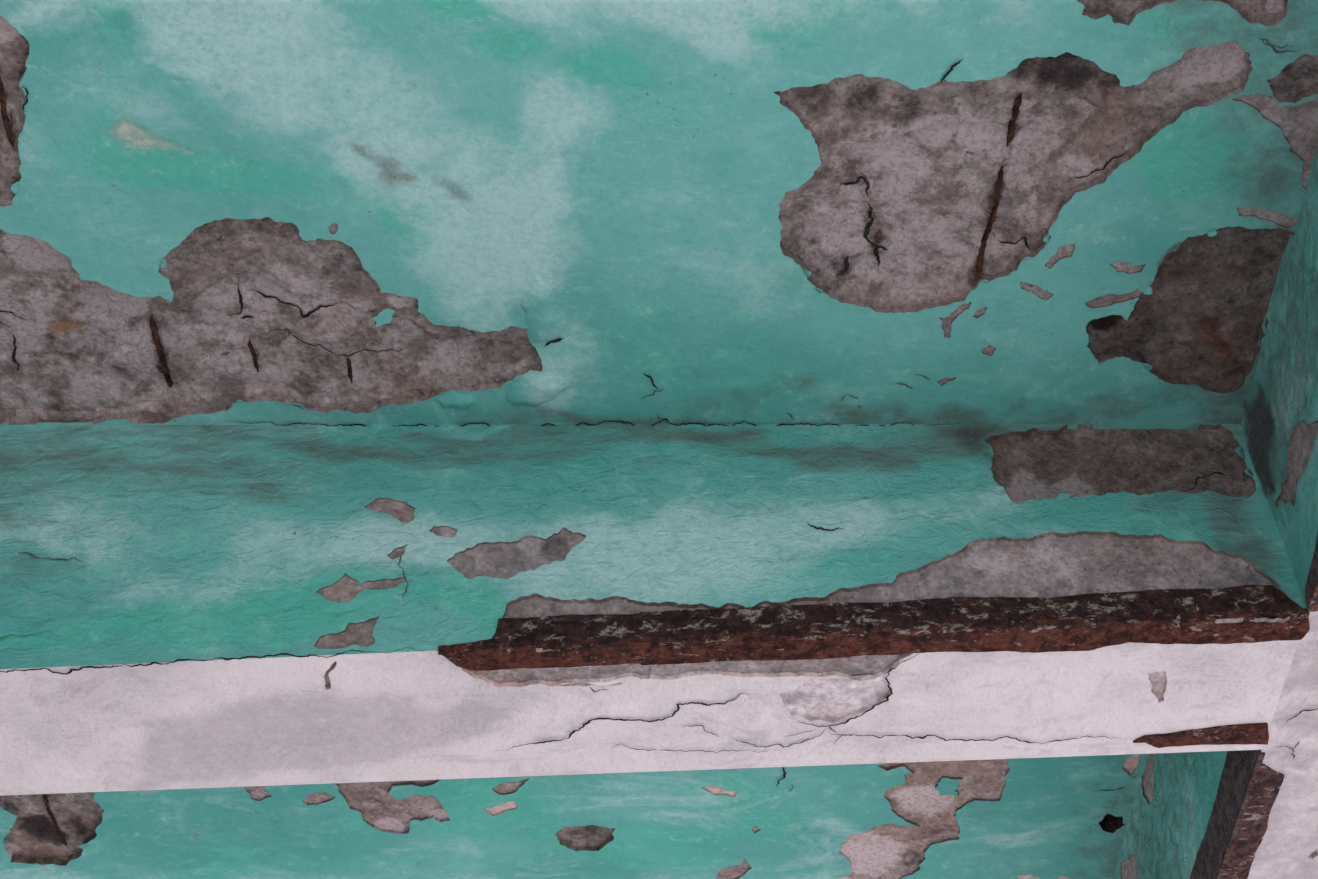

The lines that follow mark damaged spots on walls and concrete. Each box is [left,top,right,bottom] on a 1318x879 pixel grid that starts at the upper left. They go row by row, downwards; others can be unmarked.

spalling [774,41,1318,338]
crack [0,310,27,370]
spalling [0,217,543,425]
crack [228,285,409,357]
spalling [1085,207,1297,393]
spalling [985,424,1256,504]
peeling [429,526,586,579]
spalling [502,531,1286,618]
crack [497,650,1136,792]
spalling [0,792,104,866]
peeling [303,780,451,834]
peeling [839,759,1010,879]